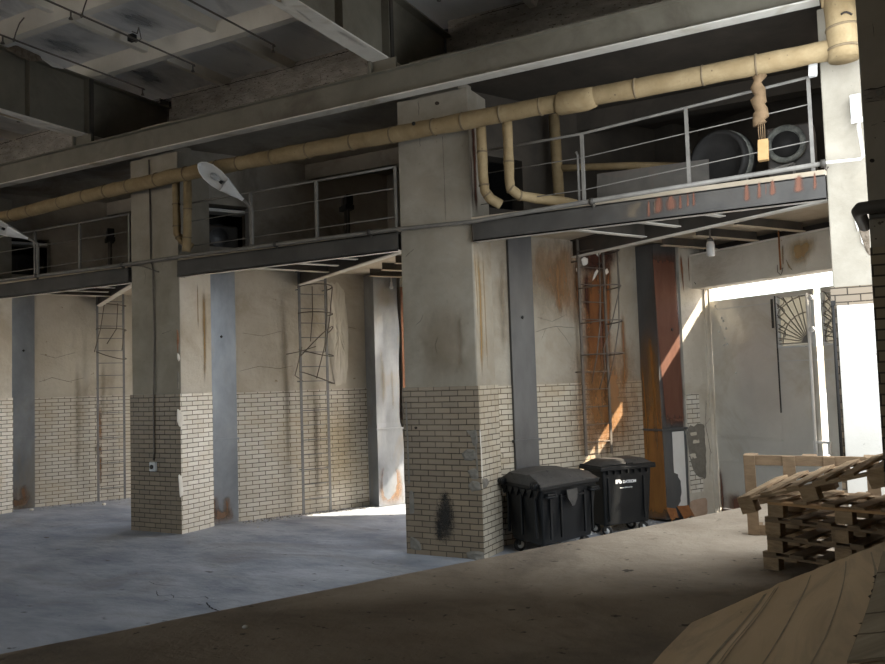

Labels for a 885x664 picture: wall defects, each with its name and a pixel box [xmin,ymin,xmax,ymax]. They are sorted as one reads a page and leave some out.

rust [197,289,206,371]
rust [538,250,628,439]
rust [642,256,690,515]
spalling [687,424,706,479]
damp [437,493,453,540]
spalling [690,498,708,517]